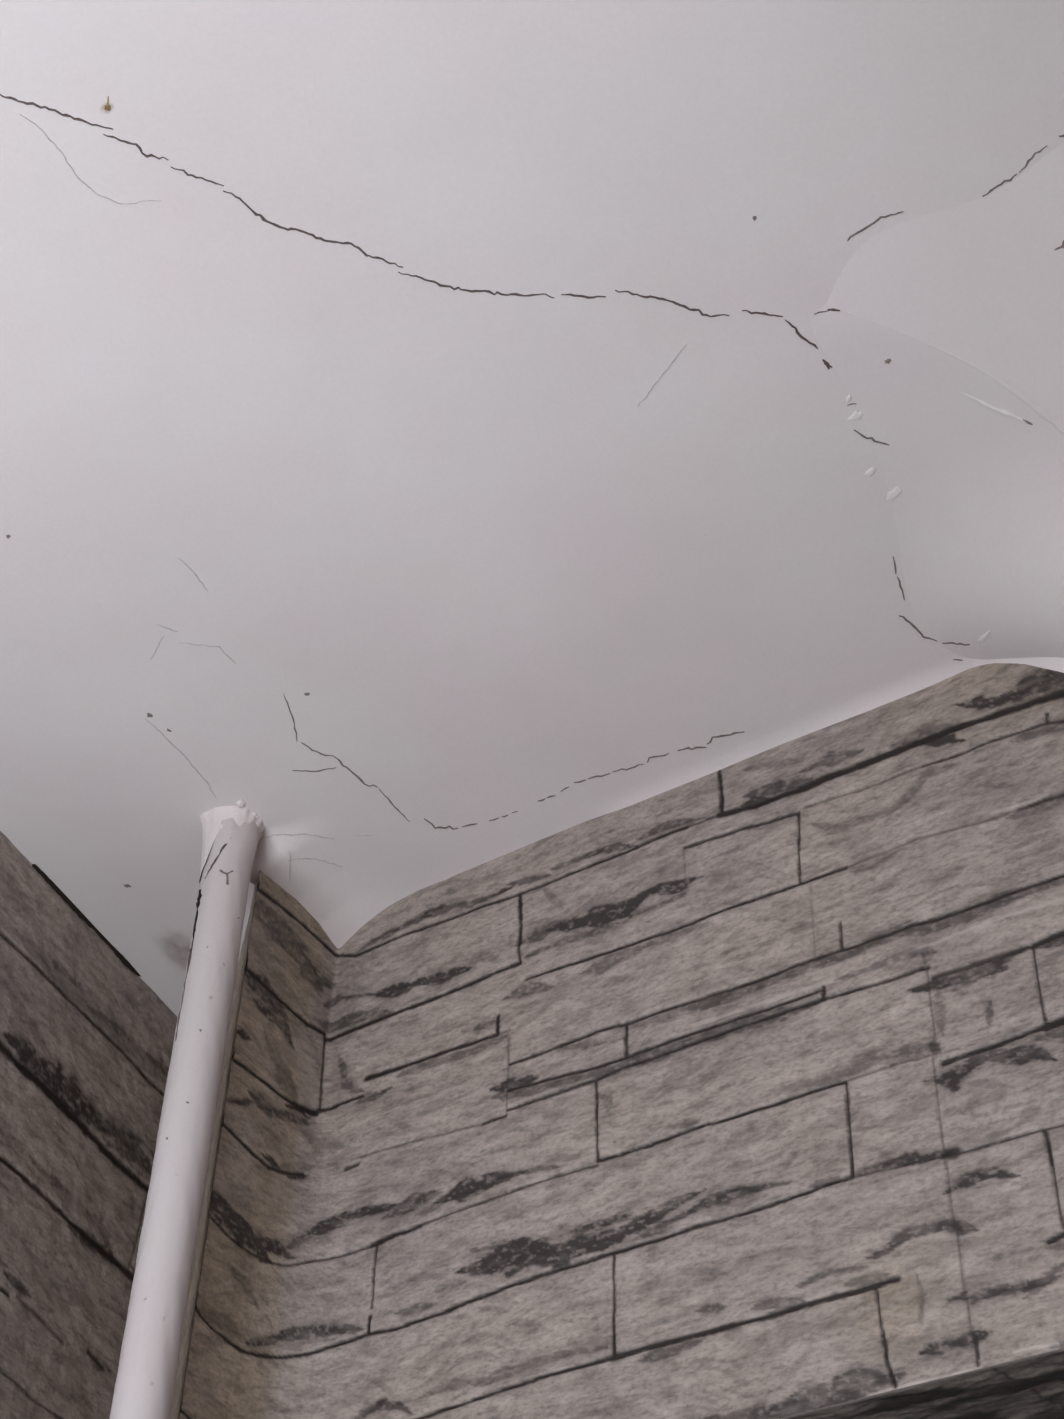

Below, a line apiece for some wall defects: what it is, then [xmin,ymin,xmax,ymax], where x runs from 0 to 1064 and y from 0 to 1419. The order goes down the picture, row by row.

crack [983,134,1064,197]
crack [0,94,840,406]
crack [847,211,903,241]
crack [847,403,889,445]
crack [893,556,970,661]
crack [284,696,744,830]